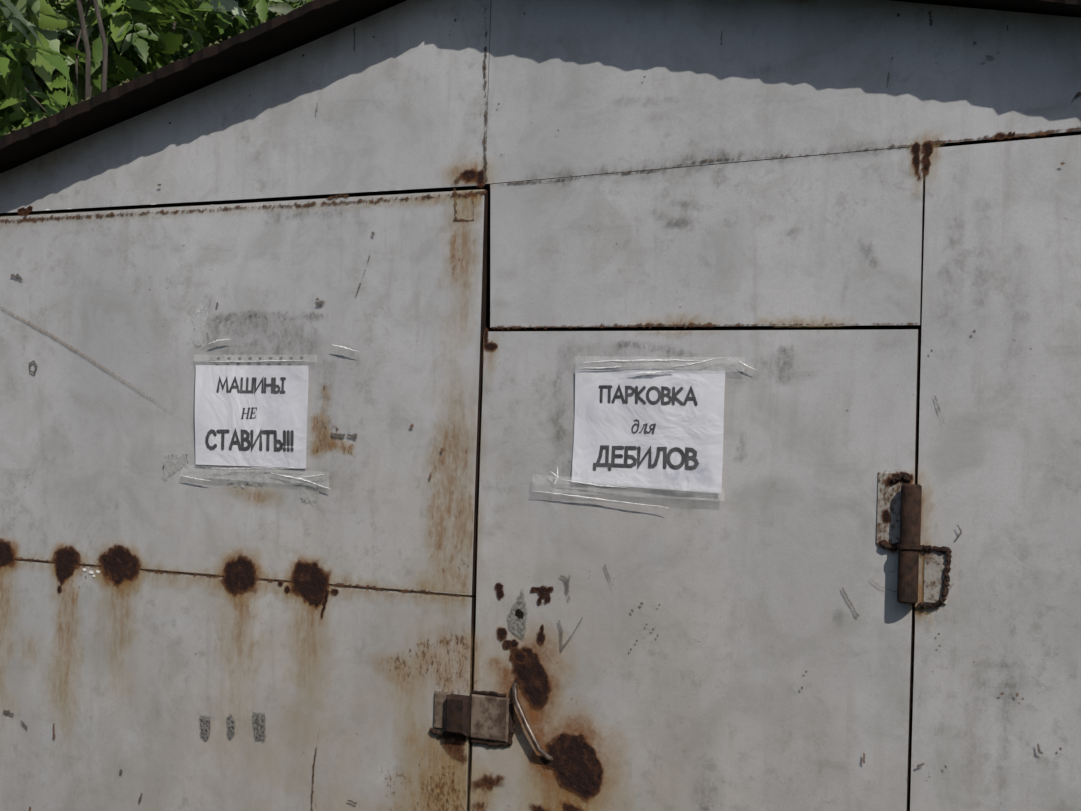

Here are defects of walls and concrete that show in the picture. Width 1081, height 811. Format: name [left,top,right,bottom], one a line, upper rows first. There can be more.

corrosion [911,127,1081,180]
corrosion [313,417,353,454]
corrosion [878,471,918,552]
corrosion [0,539,466,626]
corrosion [495,583,504,599]
corrosion [530,585,553,605]
corrosion [915,575,924,615]
corrosion [387,635,477,694]
corrosion [492,624,608,811]
corrosion [414,736,504,811]